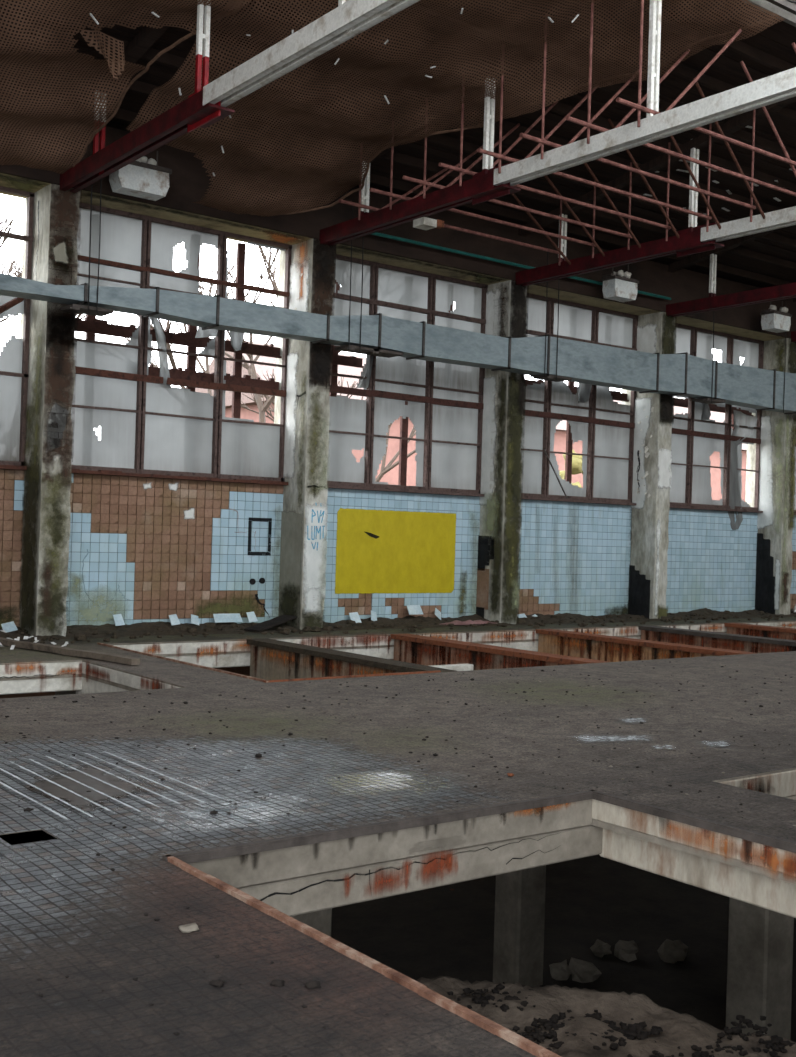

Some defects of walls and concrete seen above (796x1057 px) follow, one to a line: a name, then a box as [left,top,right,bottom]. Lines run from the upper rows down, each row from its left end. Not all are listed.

damp [0,175,298,285]
peeling [289,261,309,312]
damp [311,239,529,338]
damp [0,302,80,635]
peeling [70,353,298,619]
damp [278,342,333,630]
peeling [755,416,796,614]
rust [61,663,109,686]
rust [197,633,546,678]
rust [554,623,796,665]
crack [260,833,558,901]
rust [374,852,457,891]